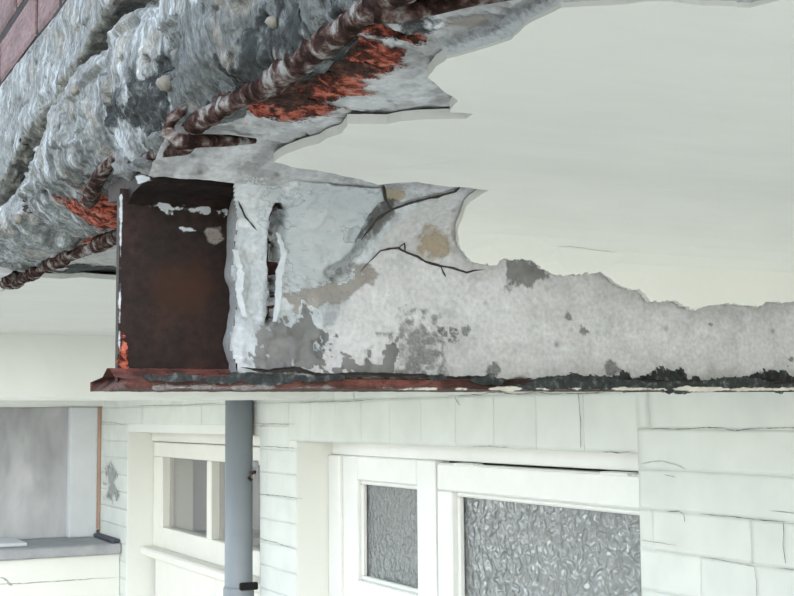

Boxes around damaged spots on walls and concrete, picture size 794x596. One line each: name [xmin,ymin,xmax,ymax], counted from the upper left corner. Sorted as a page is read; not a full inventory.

rust [246,24,427,123]
rust [52,187,117,248]
damp [355,189,405,248]
spalling [0,0,794,381]
crack [361,185,460,240]
rust [265,203,282,320]
crack [360,243,484,277]
damp [506,259,549,288]
damp [248,256,399,379]
rust [469,372,794,394]
crack [647,425,794,433]
crack [668,510,794,570]